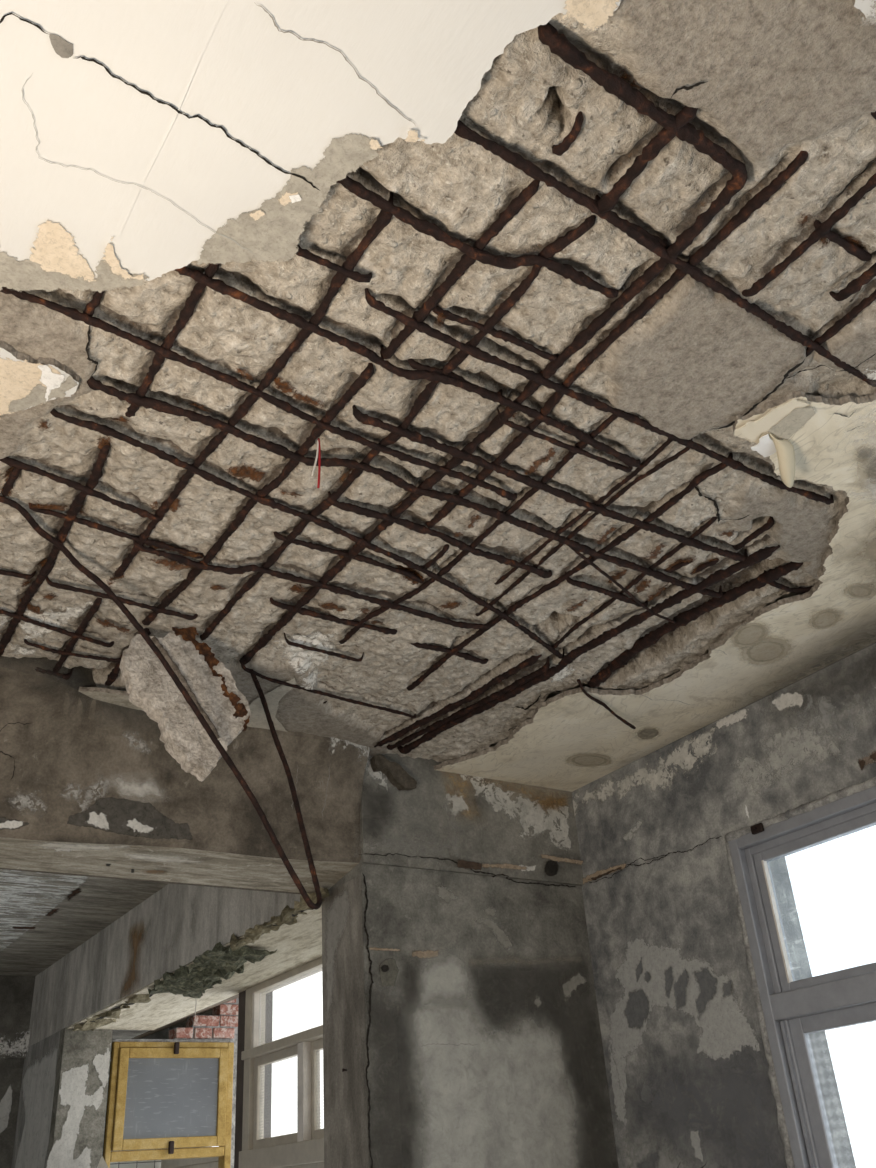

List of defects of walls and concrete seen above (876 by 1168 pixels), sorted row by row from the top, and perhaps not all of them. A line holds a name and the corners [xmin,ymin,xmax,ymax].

crack [0,13,47,34]
crack [22,0,412,253]
spalling [0,0,876,794]
rust [226,463,266,482]
rust [524,447,556,475]
rust [633,543,719,601]
leakage [731,623,876,711]
spalling [0,457,330,1031]
leakage [637,728,659,739]
peeling [0,1043,111,1168]
leakage [371,954,614,1168]
crack [359,836,722,1168]